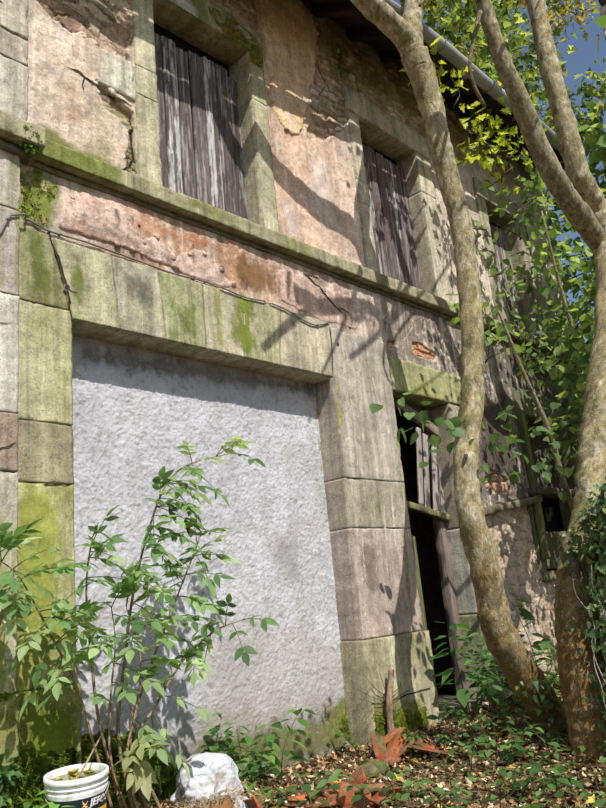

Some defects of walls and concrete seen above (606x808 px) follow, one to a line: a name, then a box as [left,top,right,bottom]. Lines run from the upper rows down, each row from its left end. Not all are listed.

spalling [36,0,133,56]
spalling [254,0,431,155]
crack [67,67,135,170]
spalling [94,81,138,176]
spalling [445,111,464,165]
water stain [128,277,151,305]
crack [303,272,349,314]
spalling [412,343,435,360]